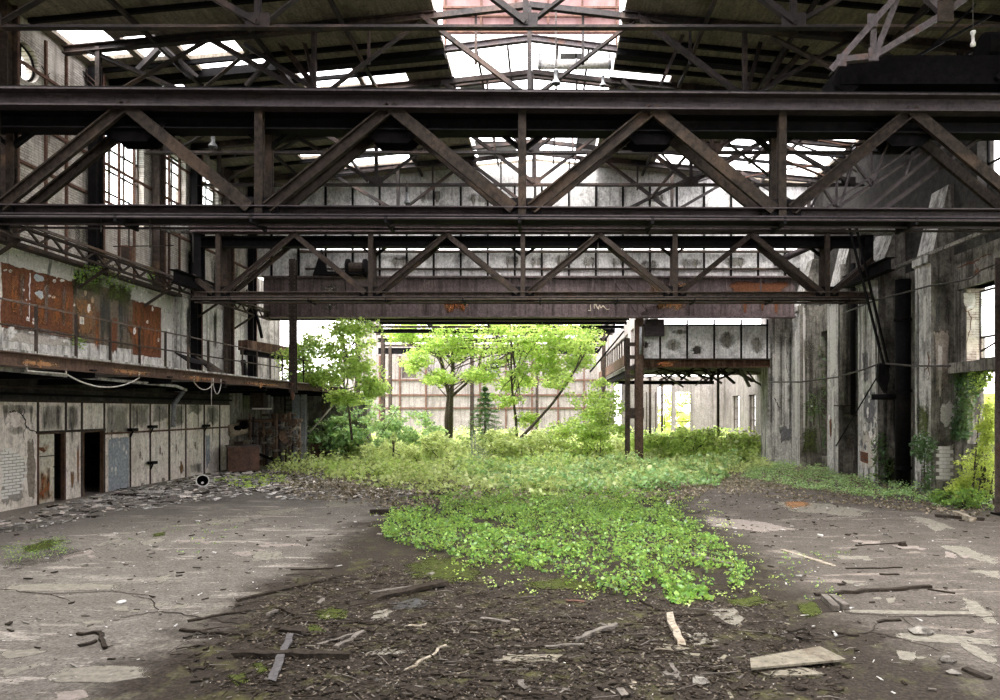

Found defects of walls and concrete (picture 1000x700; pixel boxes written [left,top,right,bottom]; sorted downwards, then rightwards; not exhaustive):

rust [0,262,74,338]
rust [729,281,789,313]
flaking render [963,293,976,308]
rust [112,301,161,358]
water stain [666,330,686,350]
water stain [720,332,732,348]
water stain [751,307,816,445]
spalling [933,328,955,429]
water stain [3,405,33,421]
water stain [44,408,77,438]
spalling [936,444,954,482]
rust [39,468,50,500]